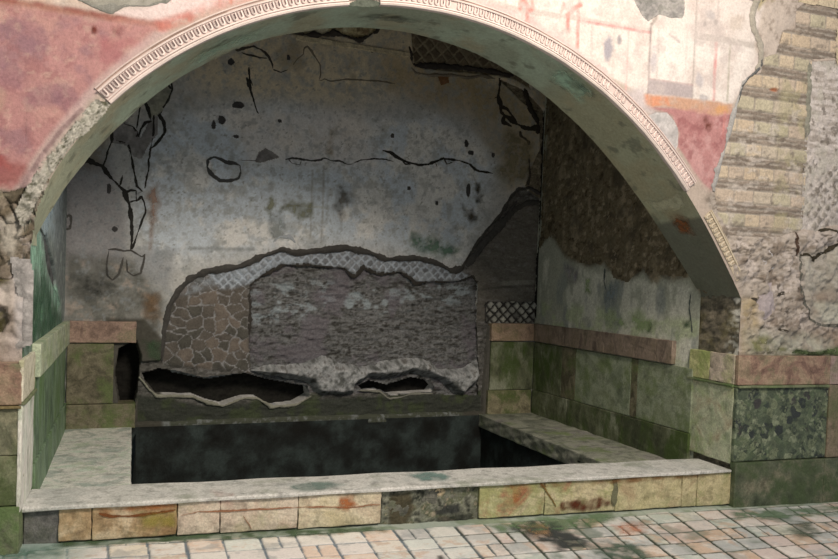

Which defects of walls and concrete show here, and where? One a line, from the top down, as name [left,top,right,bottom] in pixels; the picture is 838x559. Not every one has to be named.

flaking render [78,0,171,14]
flaking render [286,27,380,43]
crack [235,45,395,114]
flaking render [711,0,838,238]
crack [85,83,173,281]
crack [285,150,493,174]
flaking render [113,33,688,422]
crack [495,78,545,318]
crack [778,228,838,327]
flaking render [0,307,9,332]
crack [778,328,838,356]
rust [561,498,610,511]